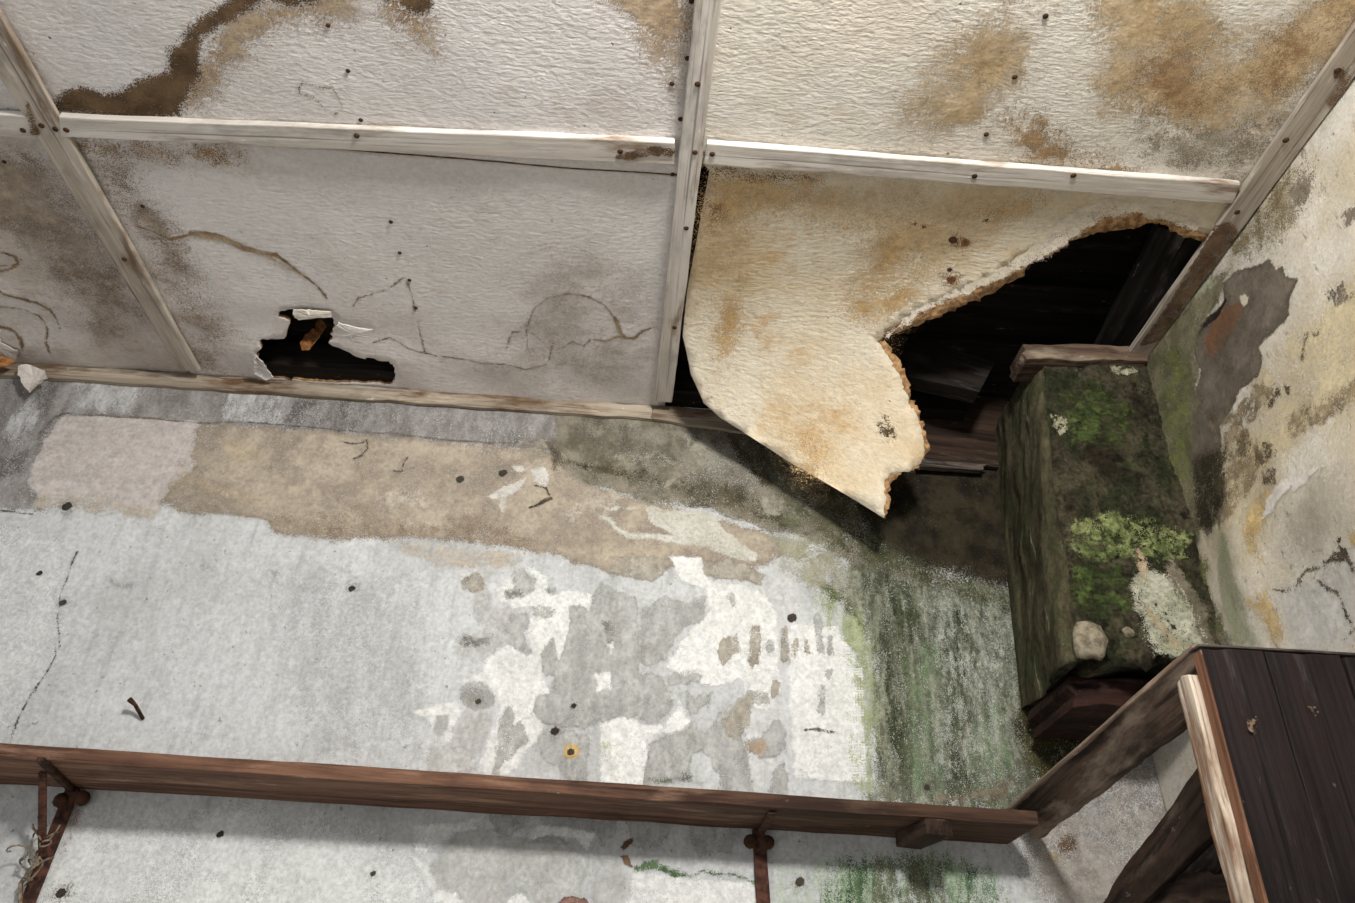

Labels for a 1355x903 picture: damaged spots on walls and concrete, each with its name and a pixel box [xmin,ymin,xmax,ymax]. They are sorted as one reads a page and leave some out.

damp [53,0,456,119]
damp [585,0,694,120]
damp [873,0,1355,179]
peeling [0,339,48,392]
peeling [253,354,273,380]
peeling [293,309,373,341]
peeling [1140,222,1238,346]
peeling [1182,258,1355,653]
peeling [425,554,789,795]
peeling [717,613,834,716]